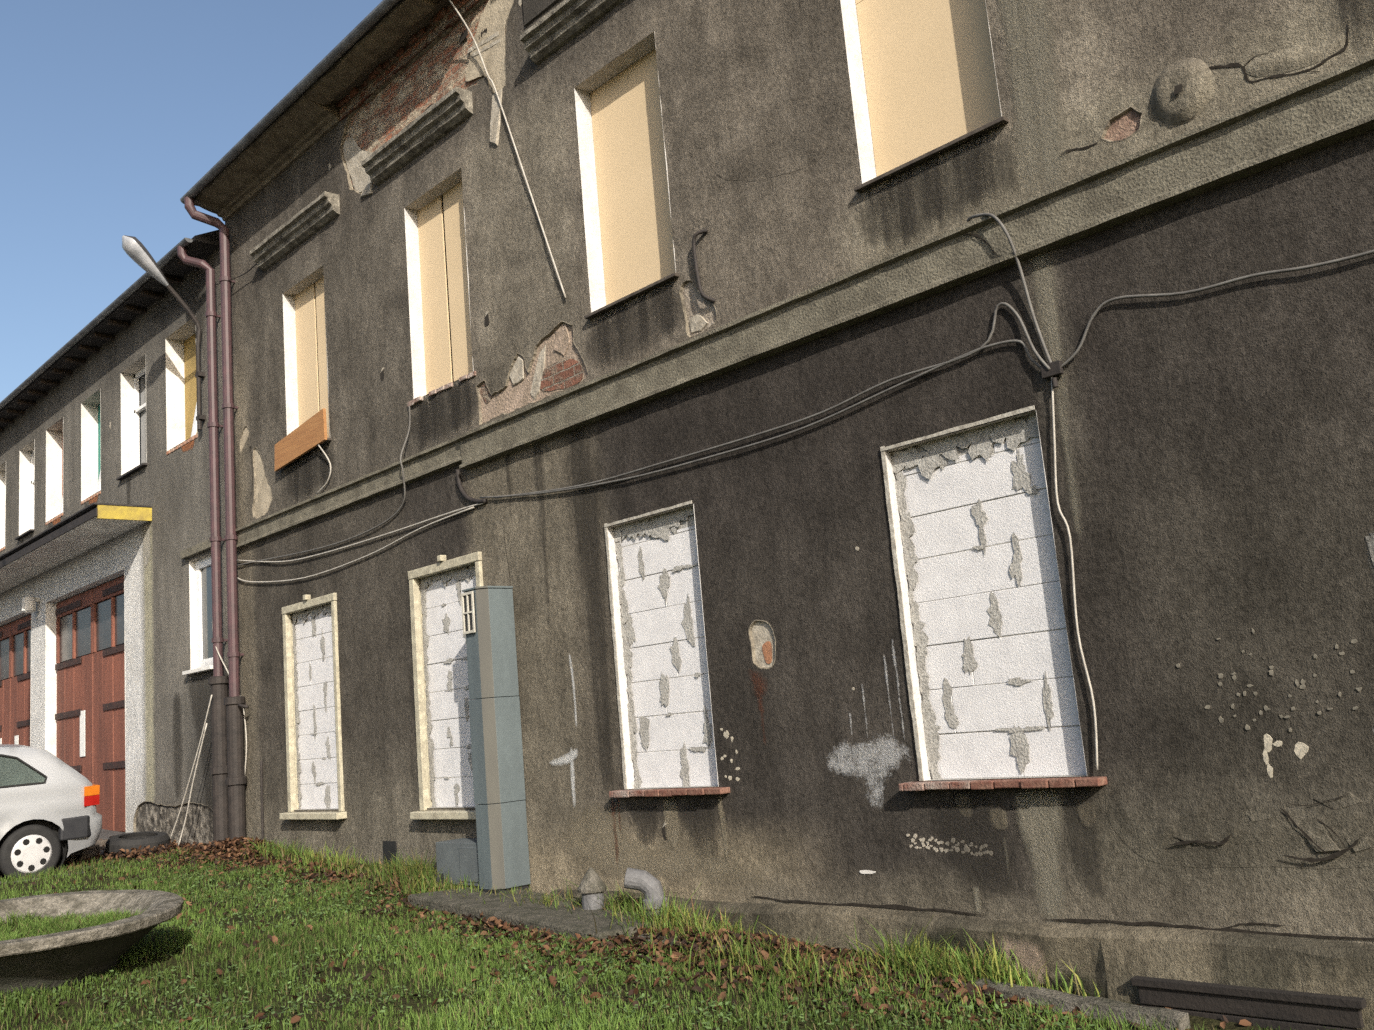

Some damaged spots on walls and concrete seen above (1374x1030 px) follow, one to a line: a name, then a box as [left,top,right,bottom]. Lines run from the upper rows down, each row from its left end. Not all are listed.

crack [1209,23,1349,83]
flaking render [329,0,522,197]
flaking render [1100,106,1143,143]
crack [1059,142,1098,158]
flaking render [476,321,589,426]
spalling [1365,533,1374,565]
flaking render [748,620,776,669]
crack [1168,834,1232,846]
crack [1280,794,1360,863]
crack [753,896,984,916]
crack [1044,919,1374,941]